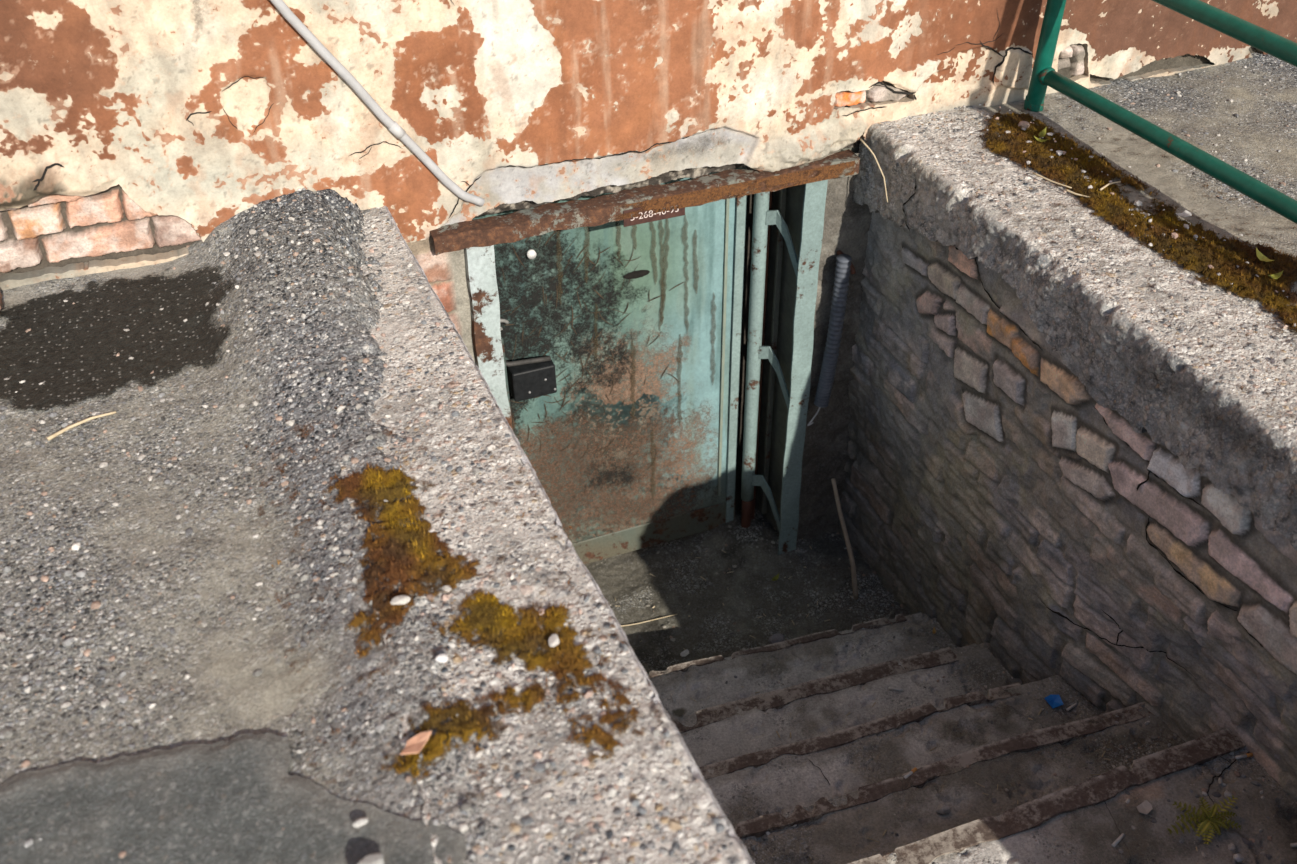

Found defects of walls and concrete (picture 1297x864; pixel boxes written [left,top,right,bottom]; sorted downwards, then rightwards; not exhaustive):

crack [937,12,1033,87]
crack [1089,54,1211,82]
peeling [1052,0,1257,89]
peeling [1253,0,1279,19]
peeling [0,0,1045,291]
rust [620,161,855,219]